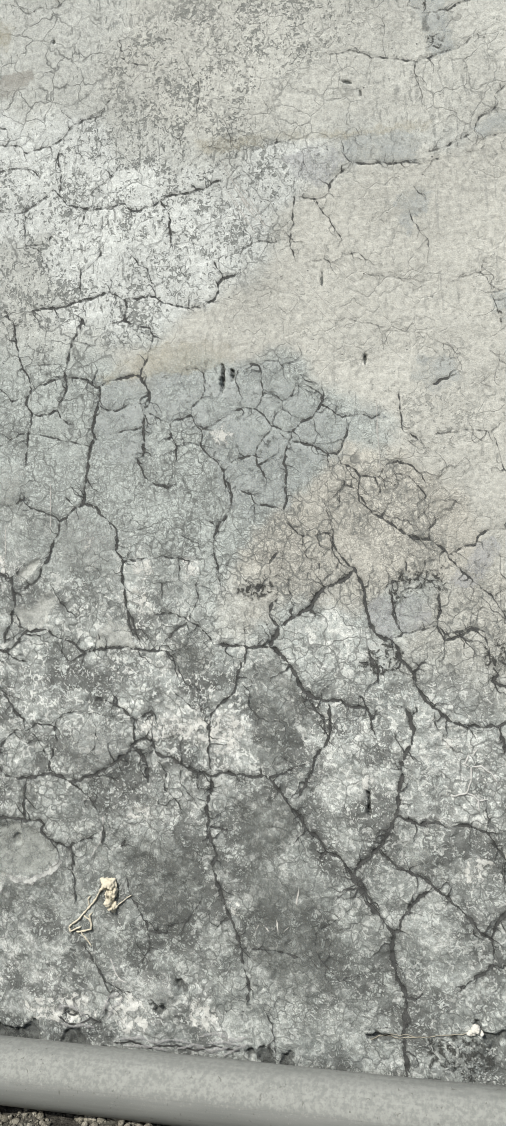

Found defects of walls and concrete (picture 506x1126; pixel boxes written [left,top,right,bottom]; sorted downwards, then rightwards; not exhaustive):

crack [329,37,471,100]
crack [0,100,221,275]
crack [238,84,505,262]
crack [0,252,506,1077]